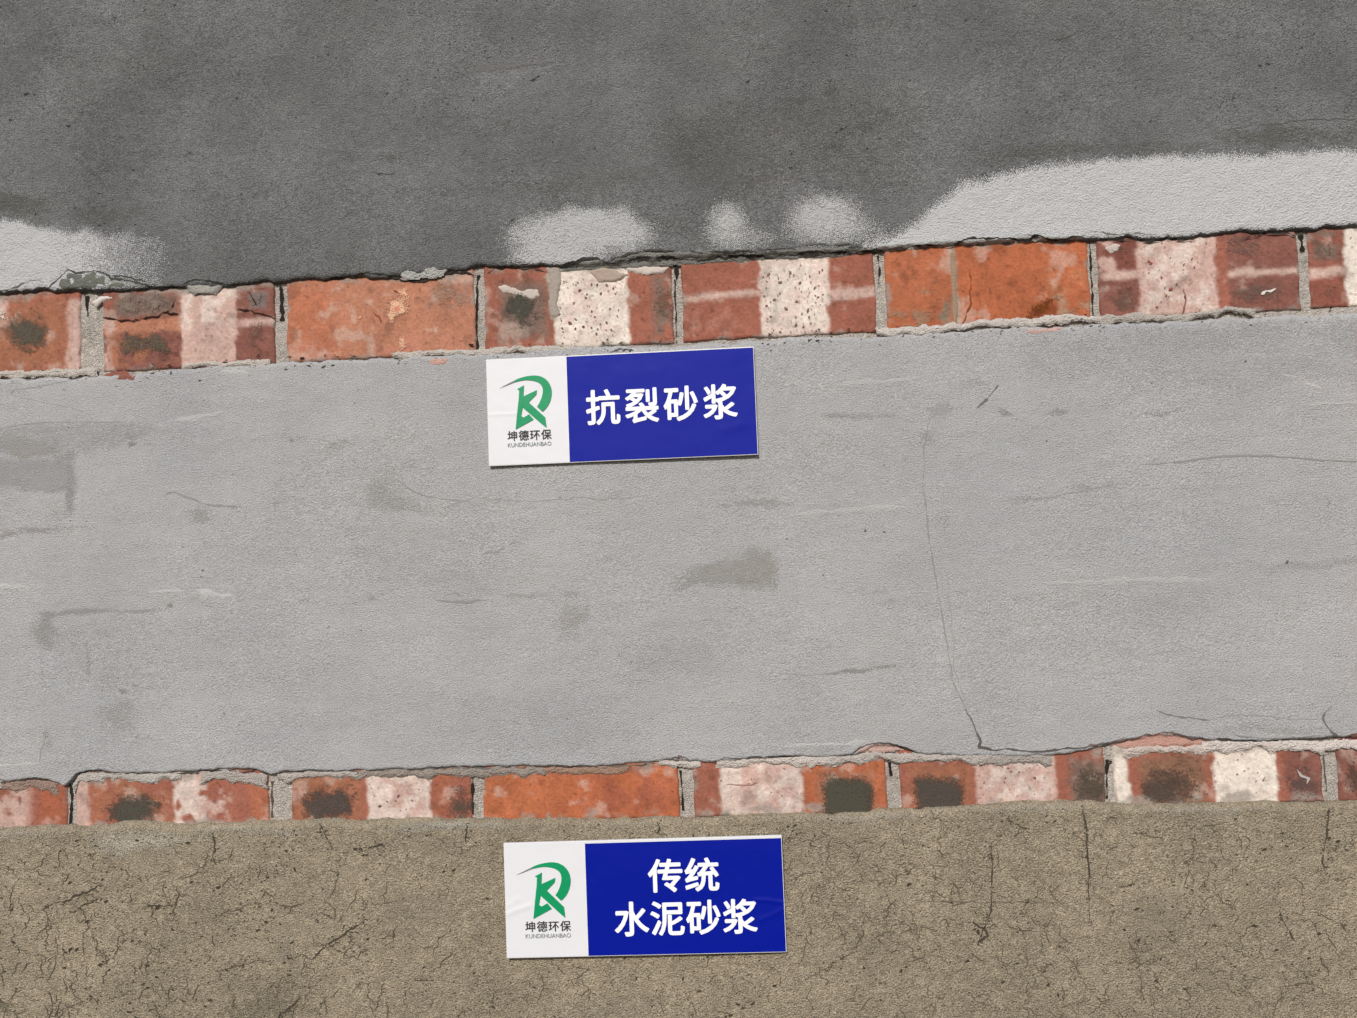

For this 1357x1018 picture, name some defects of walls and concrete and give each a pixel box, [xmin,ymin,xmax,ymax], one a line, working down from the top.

crack [0,822,601,1018]
crack [648,805,1357,1018]